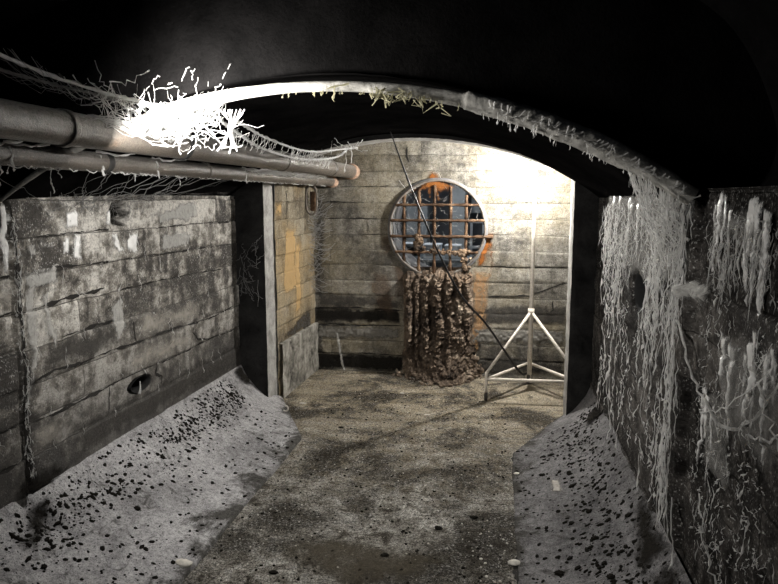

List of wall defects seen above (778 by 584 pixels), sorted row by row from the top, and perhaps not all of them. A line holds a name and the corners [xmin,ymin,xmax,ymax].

rust [422,173,449,199]
crack [0,205,234,481]